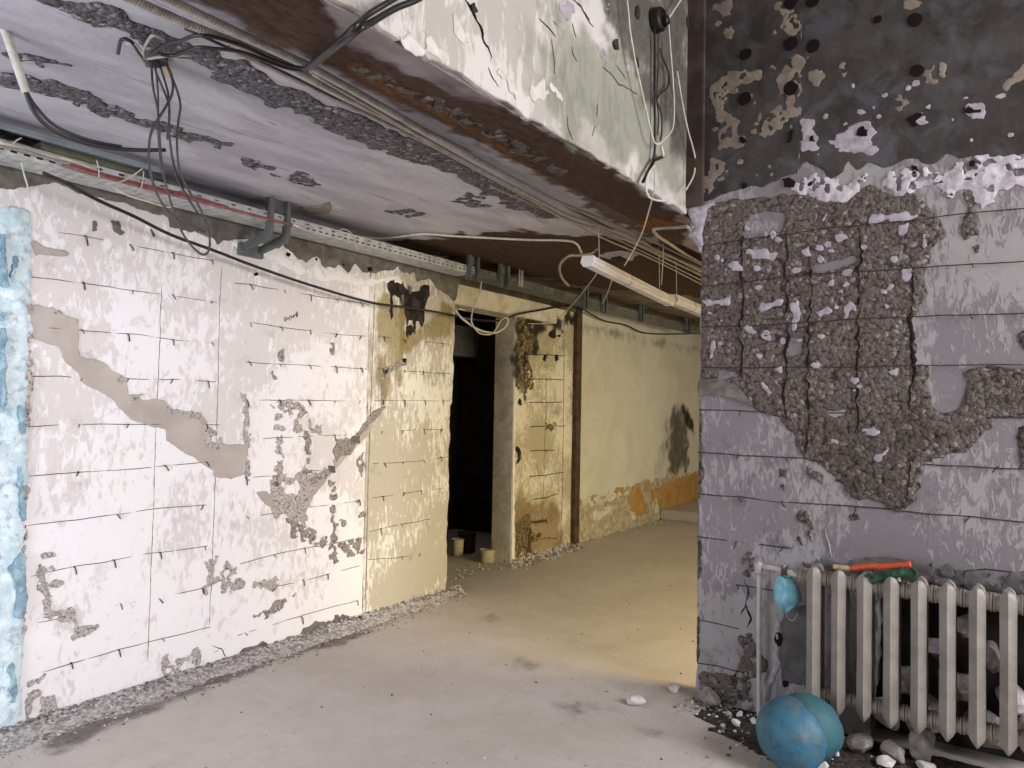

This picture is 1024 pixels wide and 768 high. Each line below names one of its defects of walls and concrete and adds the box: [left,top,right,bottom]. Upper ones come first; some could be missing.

peeling [0,206,251,728]
peeling [0,165,461,338]
spalling [36,0,559,219]
spalling [256,358,407,564]
water stain [377,294,452,400]
corrosion [183,0,702,298]
crack [465,0,516,100]
water stain [682,405,694,431]
crack [782,237,813,453]
spalling [579,54,1024,546]
crack [854,226,864,433]
crack [906,267,917,499]